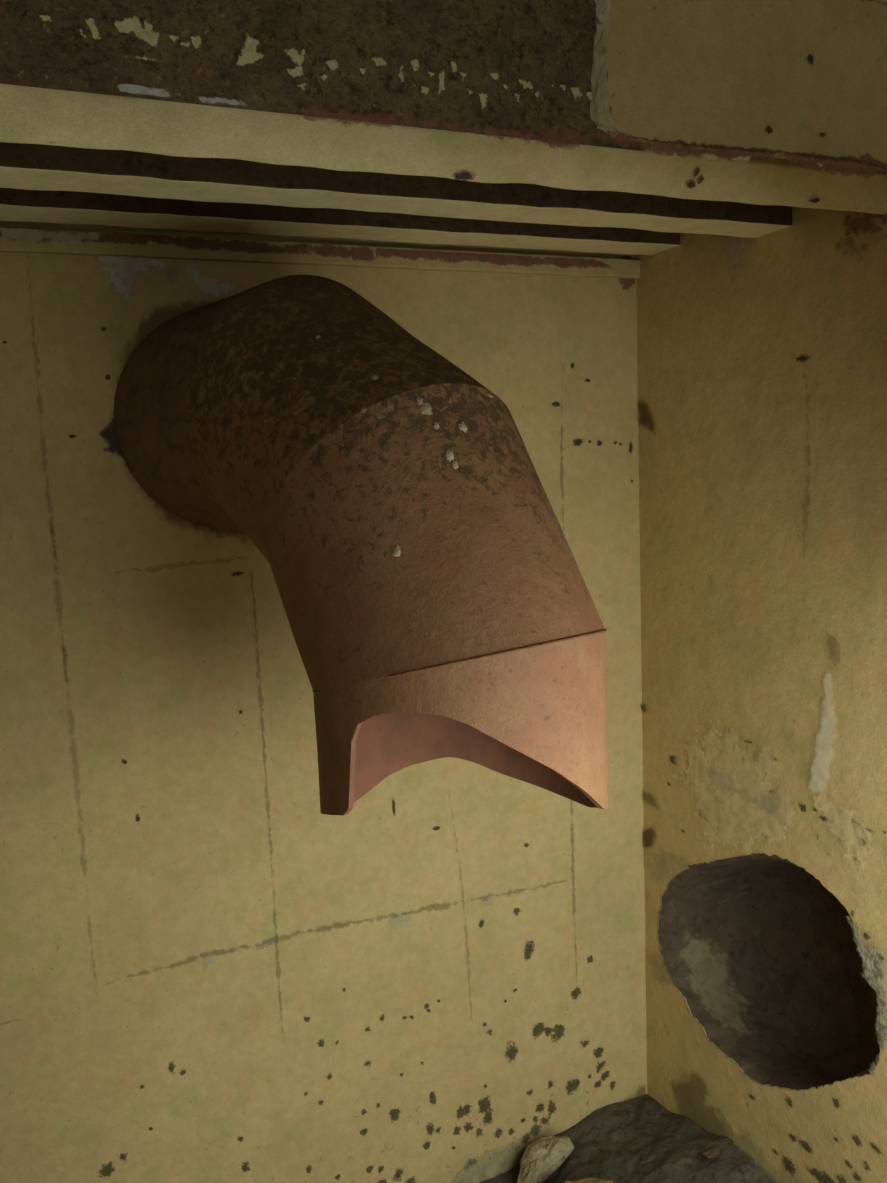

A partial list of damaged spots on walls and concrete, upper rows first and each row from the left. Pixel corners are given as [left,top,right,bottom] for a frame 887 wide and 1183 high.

peeling [119,84,170,97]
peeling [114,16,201,60]
peeling [236,35,264,66]
peeling [284,49,306,90]
peeling [291,0,887,188]
rust [100,419,131,472]
efflorescence [810,674,835,791]
spalling [847,911,887,1074]
mould [532,1023,565,1043]
mould [360,1103,401,1135]
damp [423,1041,616,1183]
damp [733,1133,871,1183]